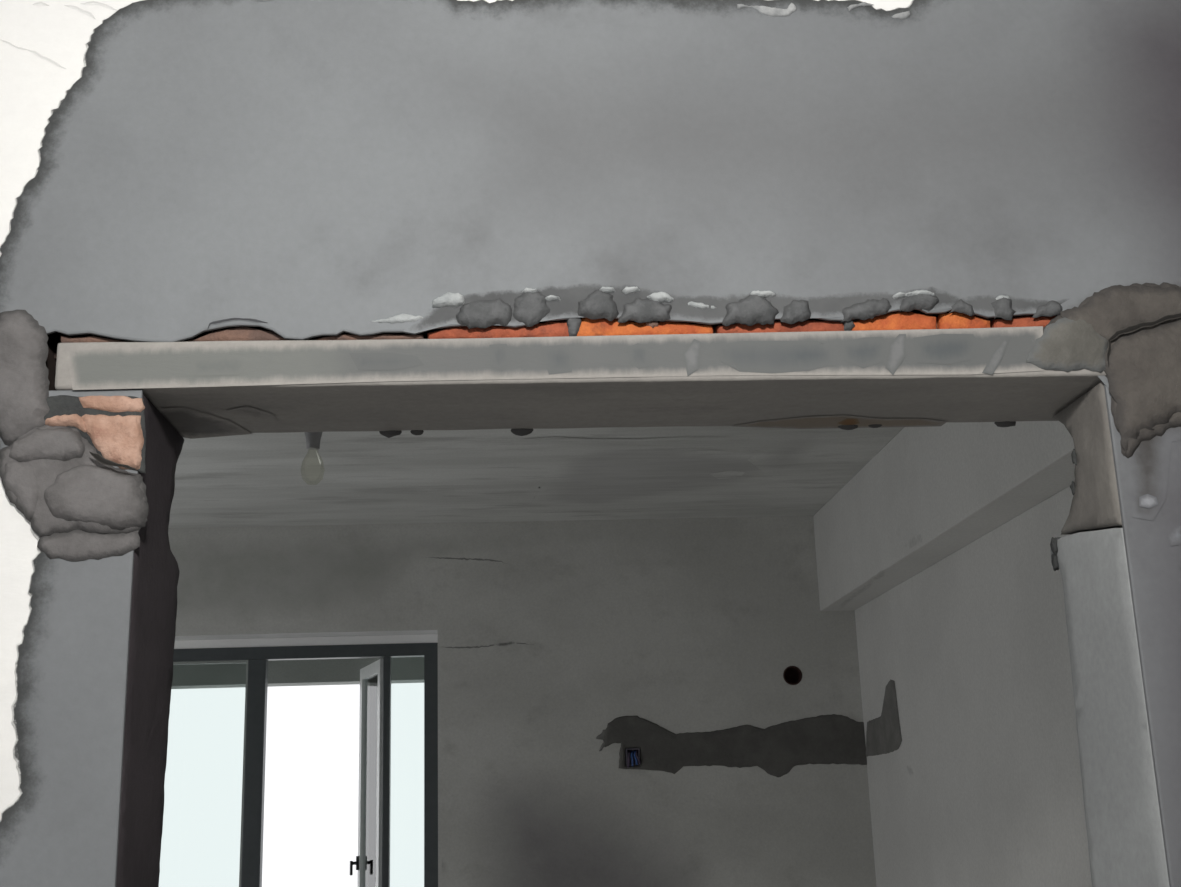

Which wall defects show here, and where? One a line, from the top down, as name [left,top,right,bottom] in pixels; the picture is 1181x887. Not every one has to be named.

spalling [184,326,287,342]
spalling [316,282,1071,340]
flaking render [44,395,146,474]